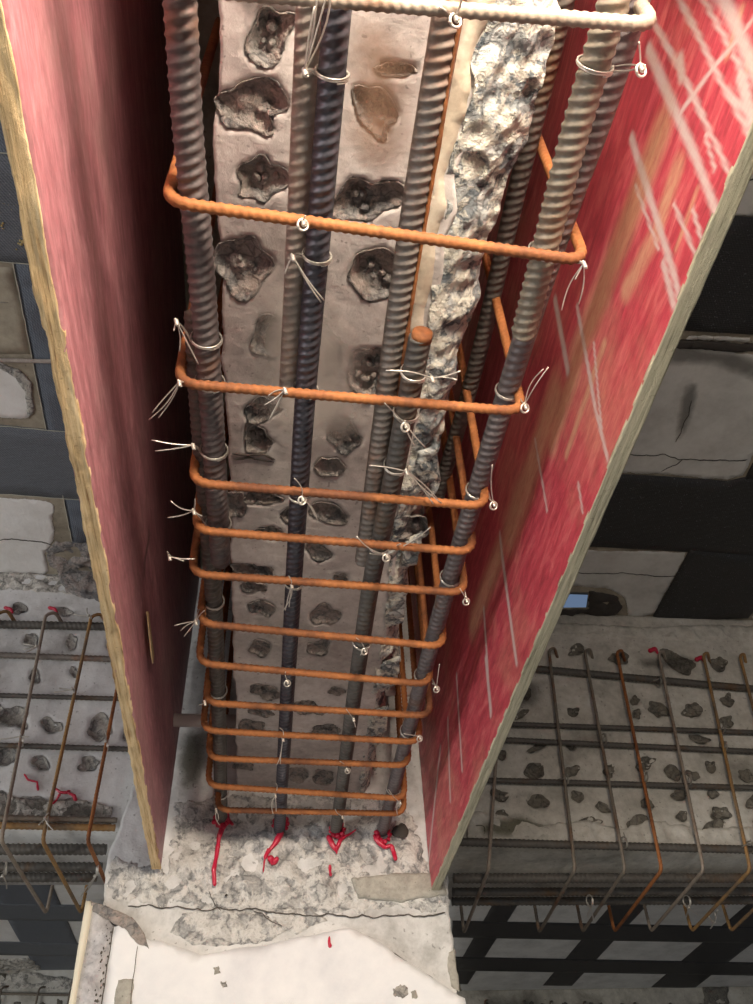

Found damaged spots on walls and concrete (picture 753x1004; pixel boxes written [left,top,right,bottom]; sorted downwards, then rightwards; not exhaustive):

spalling [495,0,561,10]
crack [630,401,746,472]
spalling [87,6,556,948]
crack [128,892,445,937]
crack [94,924,113,1004]